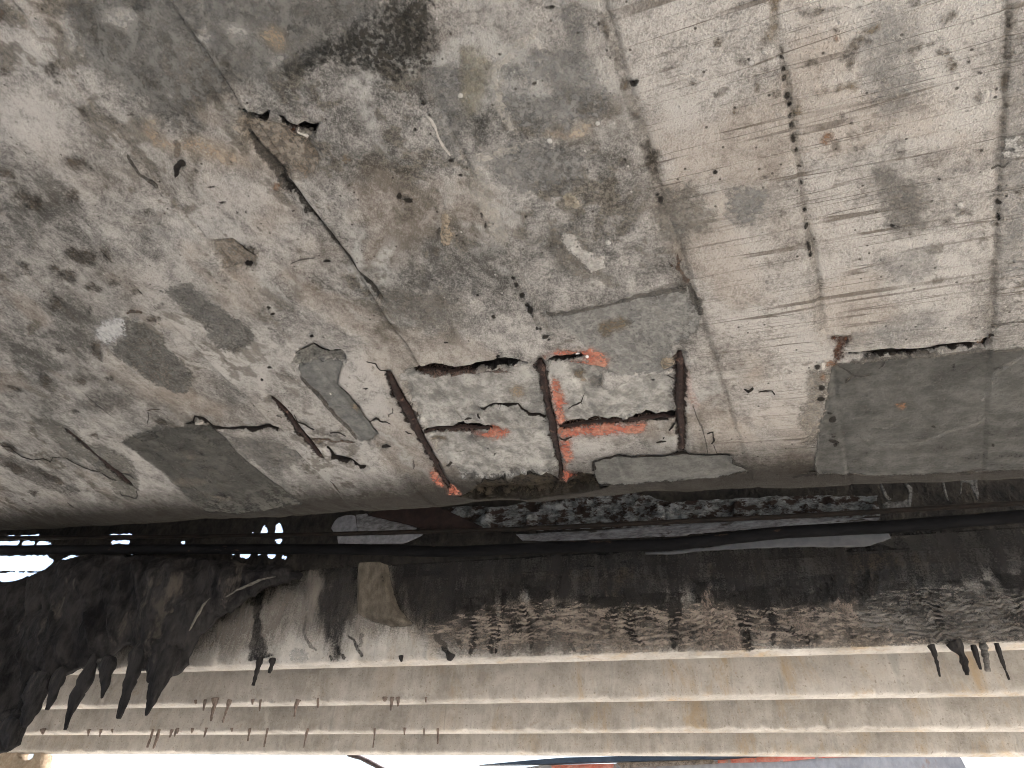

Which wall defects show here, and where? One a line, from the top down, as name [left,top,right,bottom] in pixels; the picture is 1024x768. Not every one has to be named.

crack [250,131,383,299]
crack [186,408,411,493]
rust [386,370,510,495]
rust [415,363,508,378]
spalling [399,358,674,498]
rust [537,348,697,483]
crack [838,321,1024,383]
leakage [423,582,1024,655]